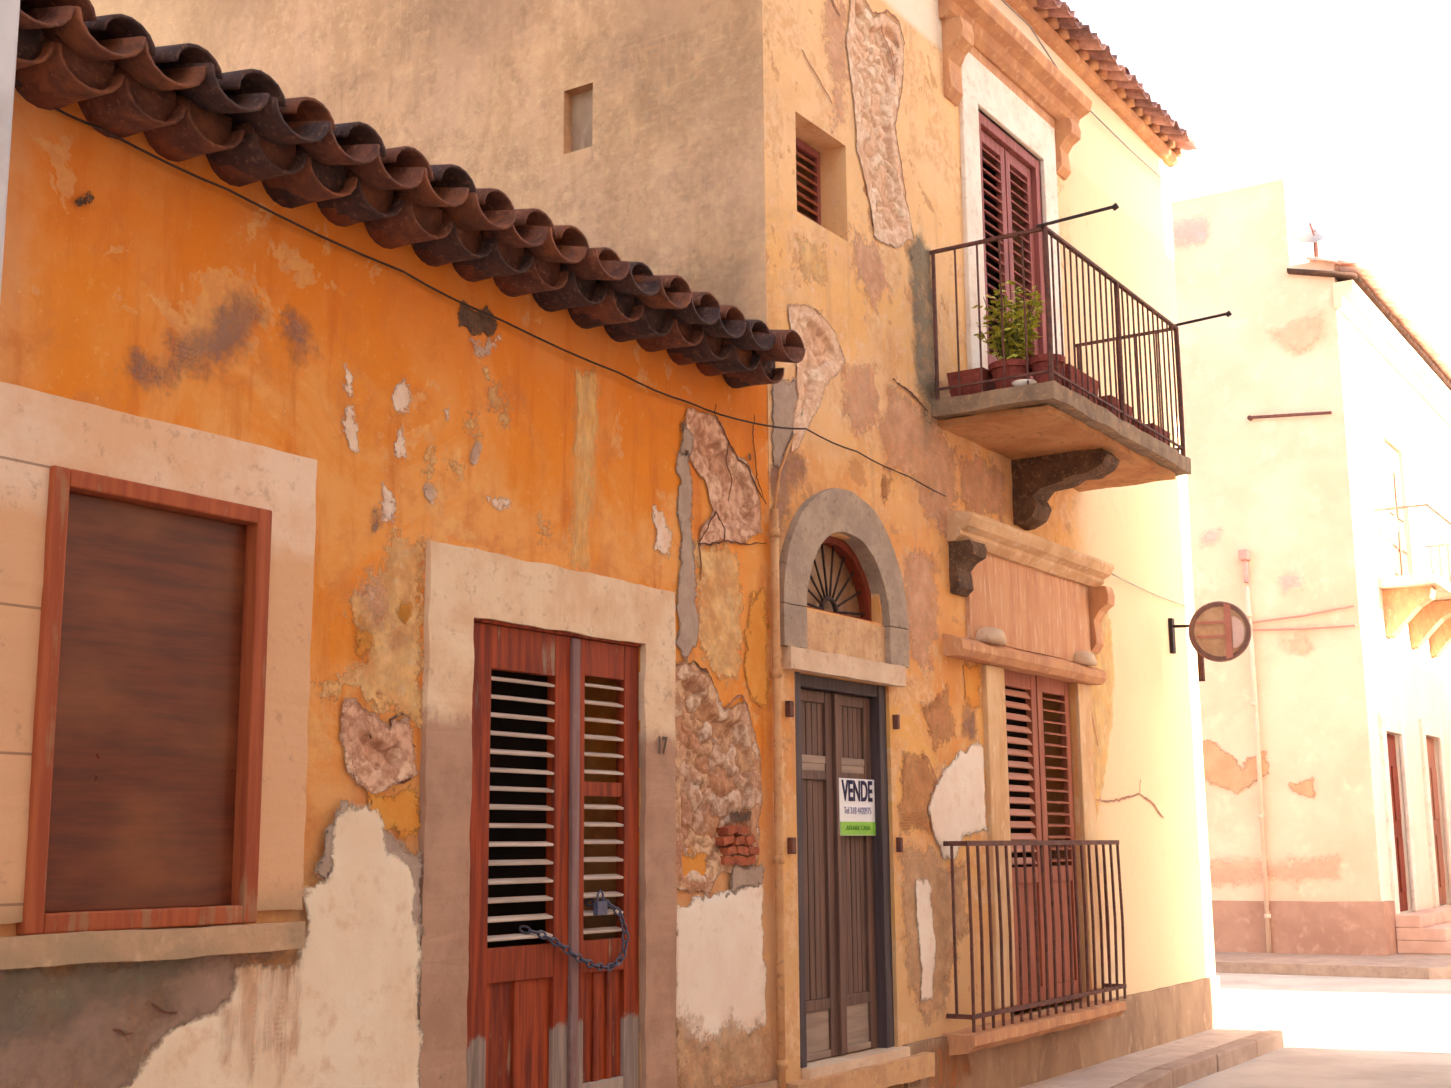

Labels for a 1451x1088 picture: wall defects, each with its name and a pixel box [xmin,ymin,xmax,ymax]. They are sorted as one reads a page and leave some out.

flaking render [823,0,914,310]
mould [132,297,259,383]
peeling [341,363,360,453]
spalling [391,300,509,505]
peeling [487,495,510,510]
peeling [788,304,1005,537]
flaking render [121,482,429,1088]
flaking render [675,407,770,1088]
peeling [897,662,988,1025]
peeling [1202,740,1269,794]
peeling [1288,778,1315,798]